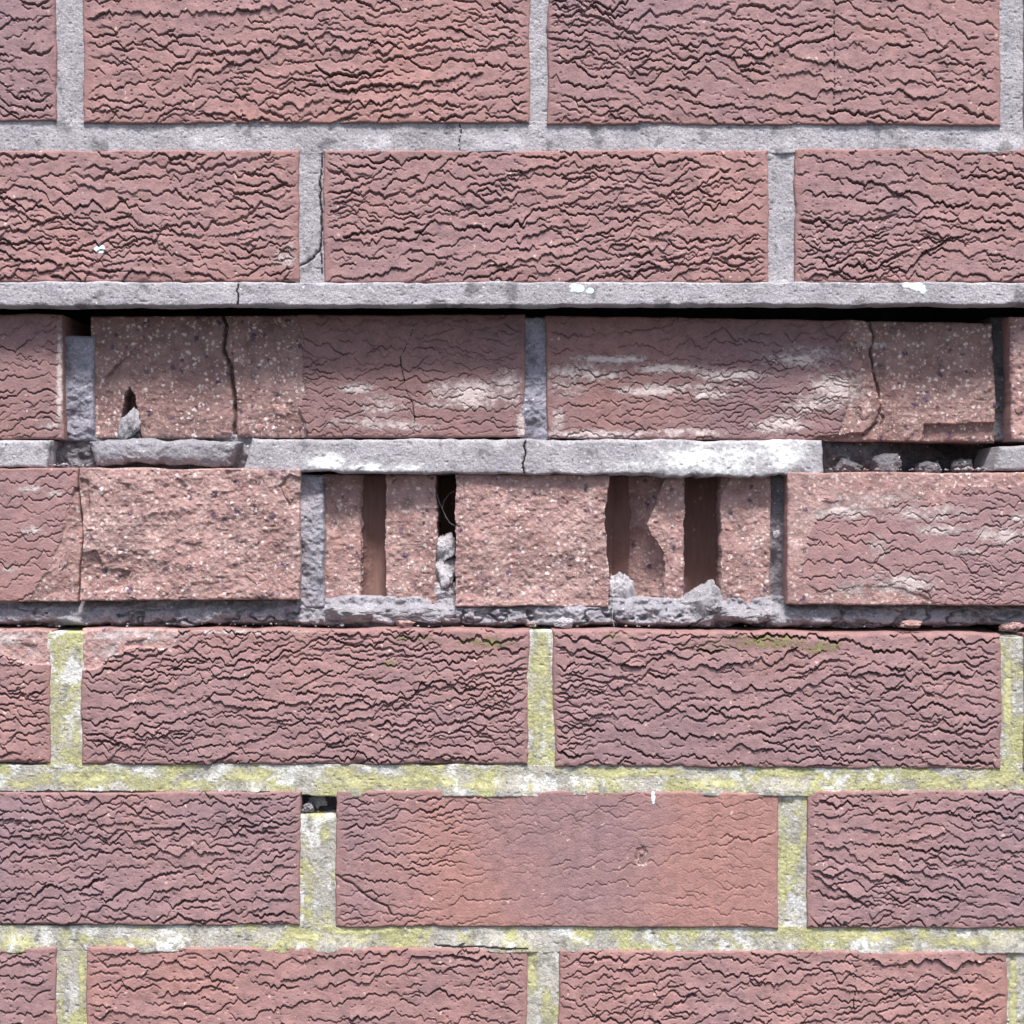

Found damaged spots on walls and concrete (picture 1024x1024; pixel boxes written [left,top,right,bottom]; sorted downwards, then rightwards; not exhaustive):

spalling [91,315,309,439]
damp [333,382,432,430]
damp [421,368,525,437]
damp [547,342,890,474]
spalling [323,474,364,598]
spalling [384,474,610,607]
spalling [628,475,685,598]
spalling [715,476,771,605]
damp [0,632,42,655]
damp [91,628,265,659]